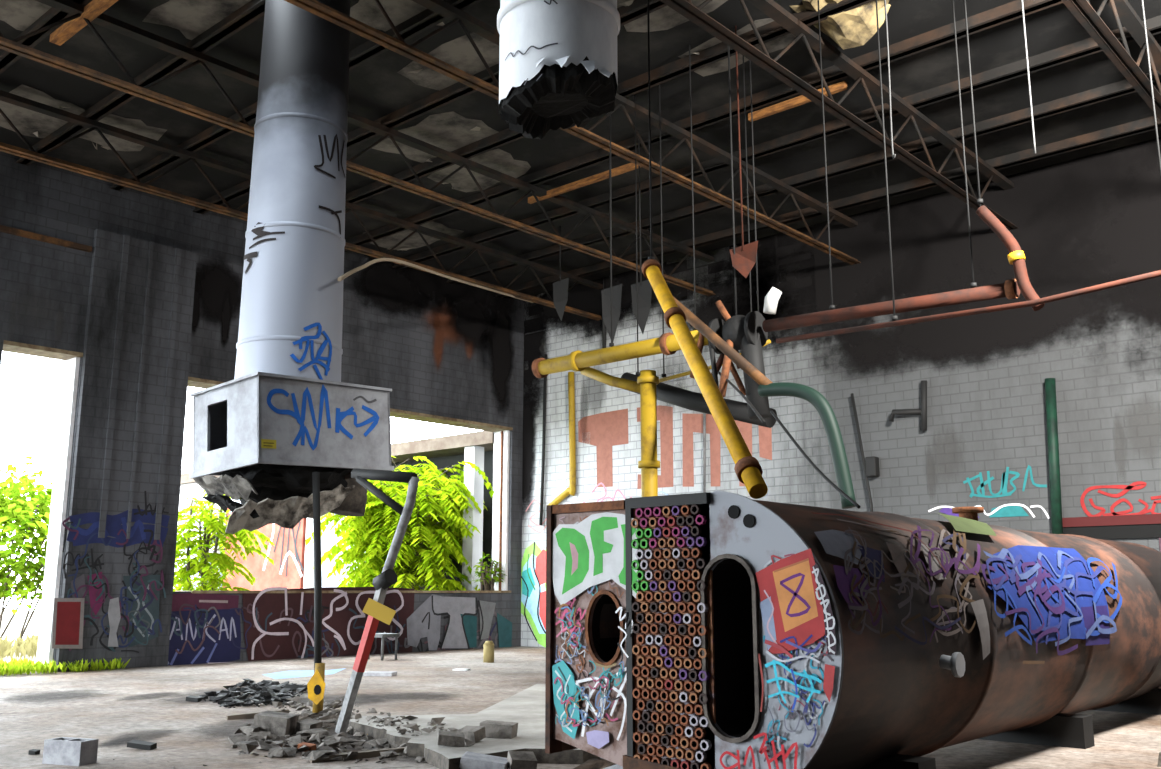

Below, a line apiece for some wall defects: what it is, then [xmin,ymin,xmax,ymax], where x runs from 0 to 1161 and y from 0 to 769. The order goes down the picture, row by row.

water stain [688,137,1161,375]